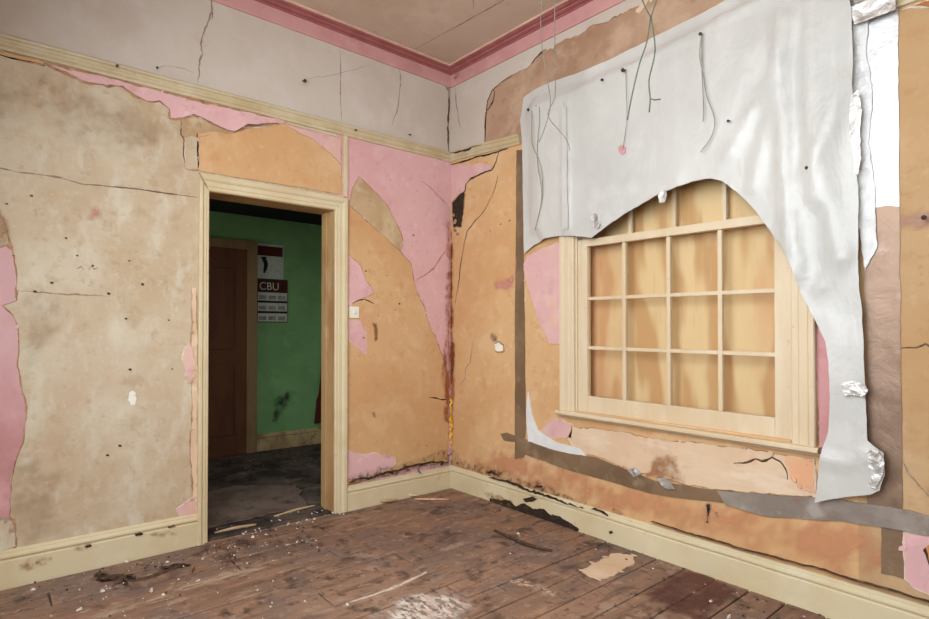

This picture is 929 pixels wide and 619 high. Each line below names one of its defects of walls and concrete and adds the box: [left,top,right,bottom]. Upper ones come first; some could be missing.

crack [162,1,213,79]
flaking render [484,0,725,144]
crack [0,167,198,198]
peeling [32,57,287,171]
crack [180,124,199,168]
crack [415,76,512,303]
corrosion [444,229,455,422]
peeling [523,241,560,345]
leakage [349,452,667,516]
flaking render [540,418,818,497]
crack [738,454,788,480]
peeling [898,532,929,595]